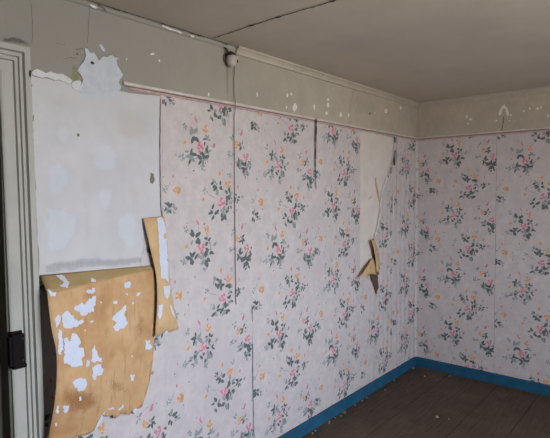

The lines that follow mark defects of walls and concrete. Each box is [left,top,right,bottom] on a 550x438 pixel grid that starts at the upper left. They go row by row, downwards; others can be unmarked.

crack [56,0,336,59]
flaking render [29,44,179,337]
peeling [360,239,380,293]